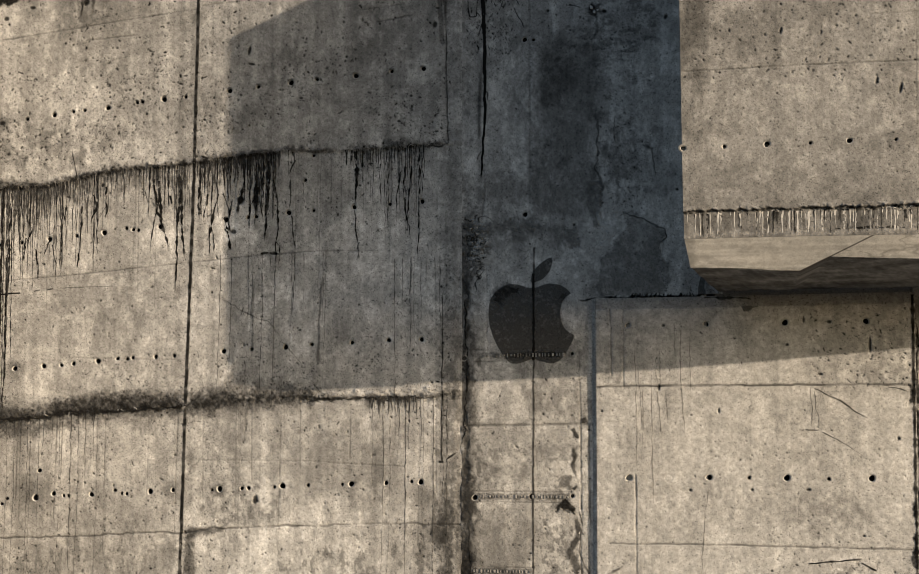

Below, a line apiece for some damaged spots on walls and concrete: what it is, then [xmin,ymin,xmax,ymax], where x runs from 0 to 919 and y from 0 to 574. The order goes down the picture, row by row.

water stain [0,144,448,507]
water stain [185,527,223,574]